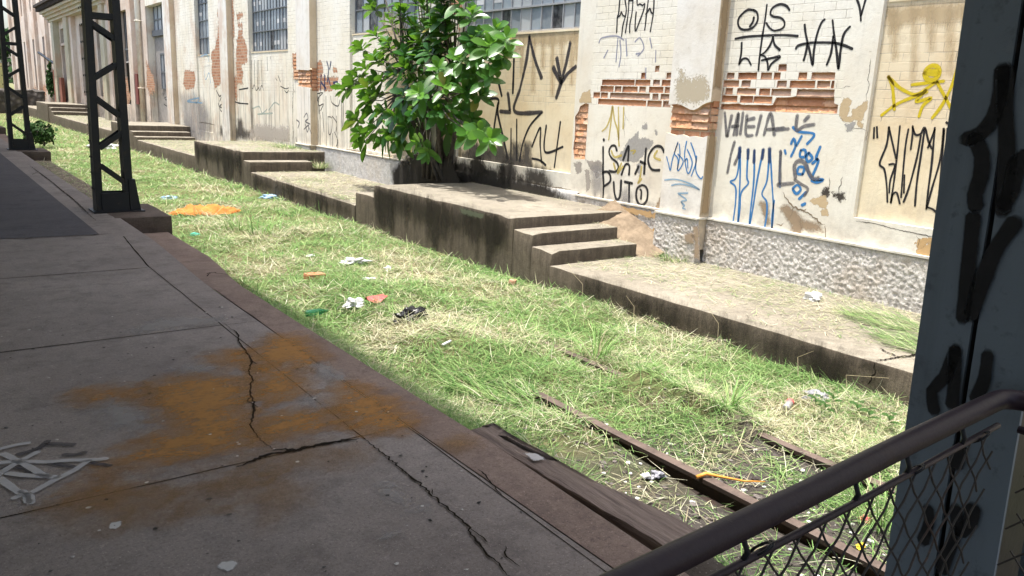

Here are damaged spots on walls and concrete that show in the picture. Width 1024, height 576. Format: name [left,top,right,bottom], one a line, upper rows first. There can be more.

peeling [183,70,195,90]
peeling [211,13,221,88]
peeling [232,0,248,100]
spalling [292,53,338,92]
spalling [574,64,868,192]
leakage [759,202,821,233]
corrosion [59,350,257,506]
crack [224,323,519,576]